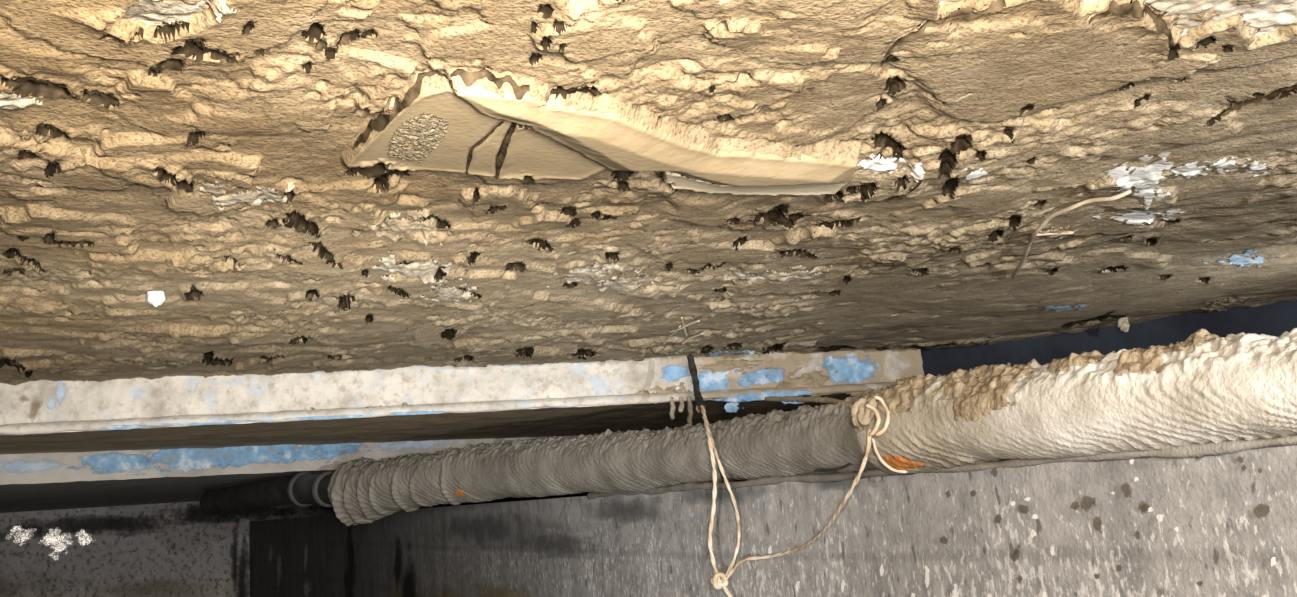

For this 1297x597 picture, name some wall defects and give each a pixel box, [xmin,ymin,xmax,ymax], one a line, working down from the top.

spalling [99,0,265,77]
spalling [529,4,567,66]
spalling [1146,0,1297,61]
crack [1207,85,1297,126]
peeling [650,342,879,413]
peeling [0,440,457,475]
water stain [394,540,415,597]